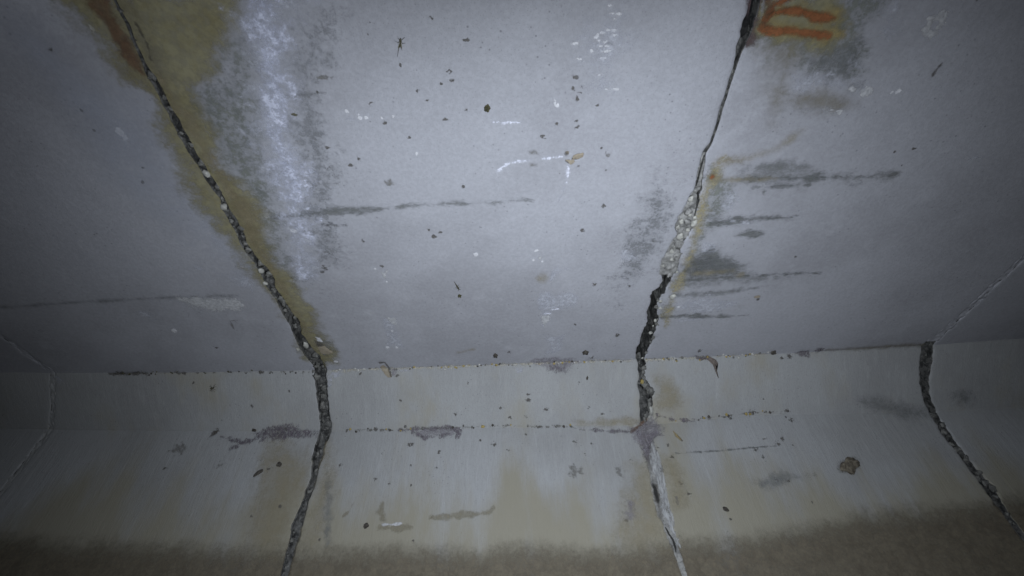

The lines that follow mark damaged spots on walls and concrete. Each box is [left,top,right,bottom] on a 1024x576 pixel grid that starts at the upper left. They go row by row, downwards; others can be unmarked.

crack [135,23,331,576]
damp [195,0,335,280]
damp [0,500,1024,576]
crack [636,0,754,576]
damp [662,244,749,321]
damp [701,169,762,238]
corrosion [745,0,844,47]
crack [919,255,1024,542]